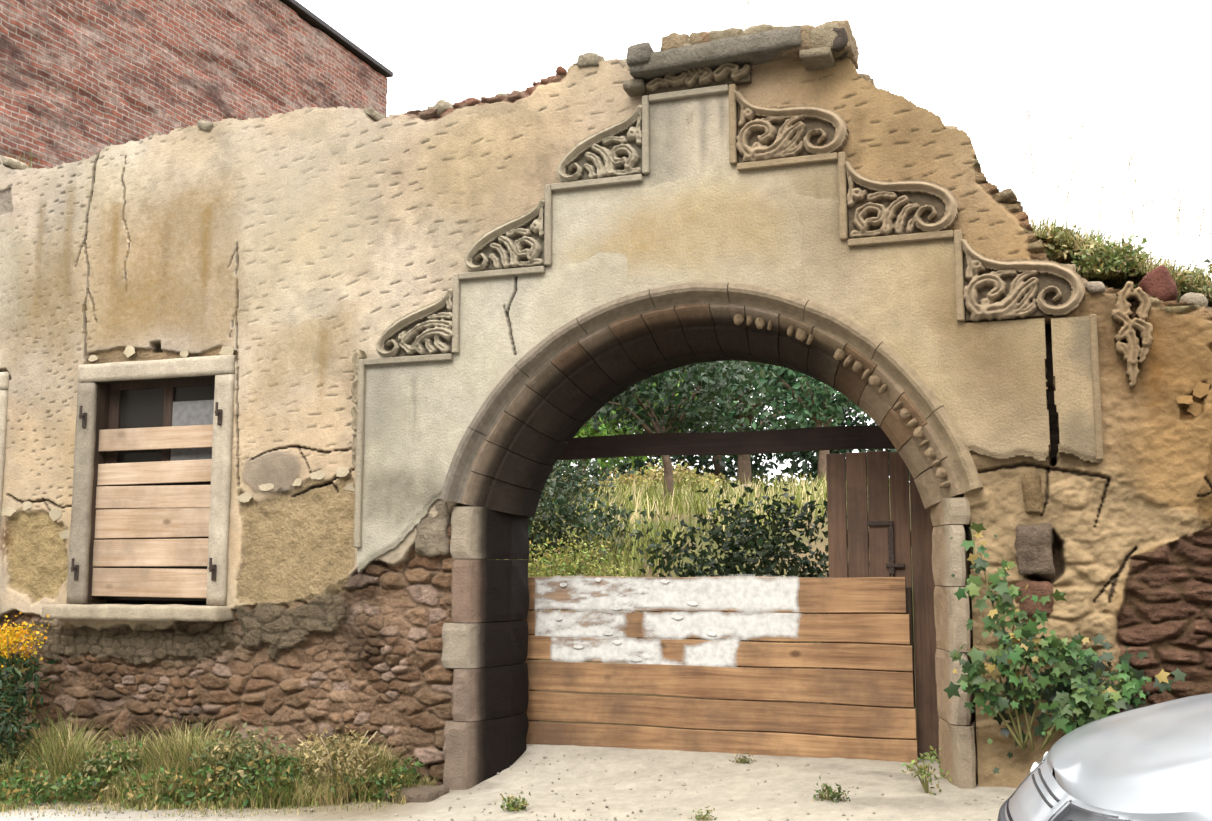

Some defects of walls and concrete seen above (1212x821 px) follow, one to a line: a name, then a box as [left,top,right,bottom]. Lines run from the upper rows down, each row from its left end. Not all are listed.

crack [74,151,131,358]
crack [228,243,355,486]
crack [503,276,518,356]
peeling [237,483,274,503]
peeling [292,466,355,492]
flaking render [0,501,465,786]
flaking render [1115,527,1212,711]